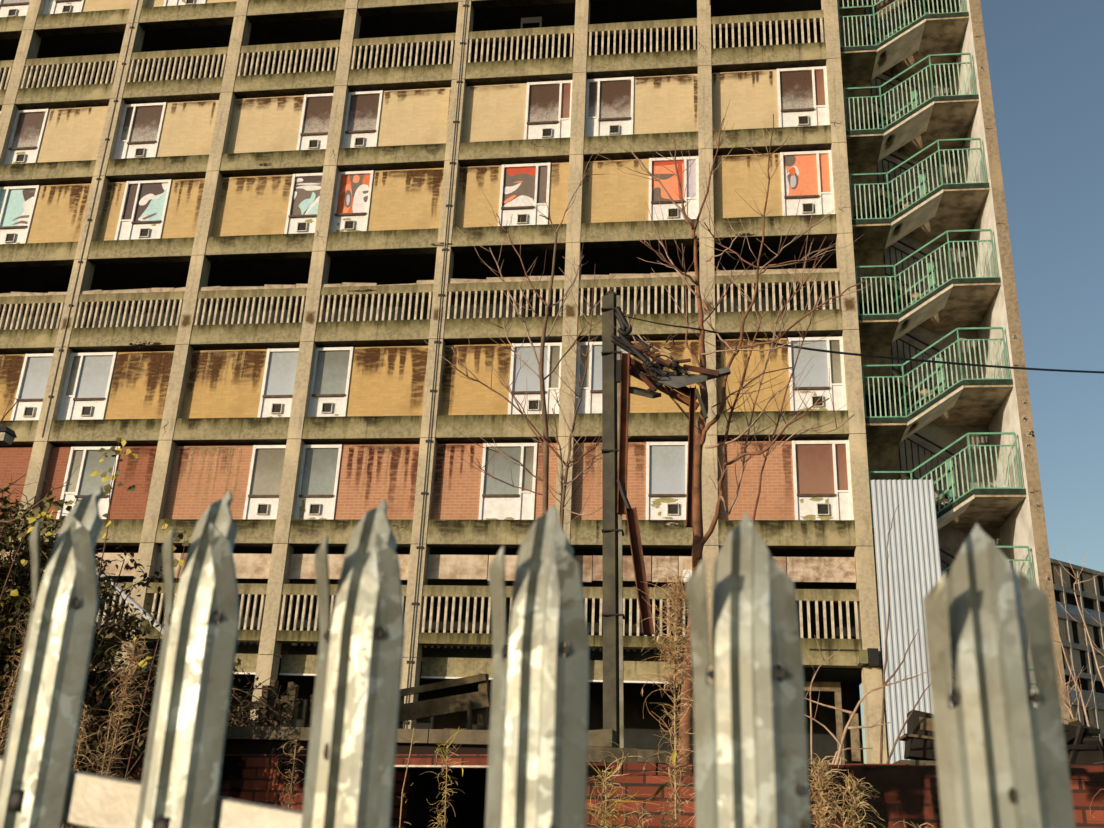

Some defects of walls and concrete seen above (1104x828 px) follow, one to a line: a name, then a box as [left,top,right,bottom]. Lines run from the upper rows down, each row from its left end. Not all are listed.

damp [42,185,89,220]
damp [223,176,292,194]
damp [375,169,444,206]
damp [112,352,174,406]
damp [188,350,265,390]
damp [355,347,428,403]
damp [347,445,419,489]